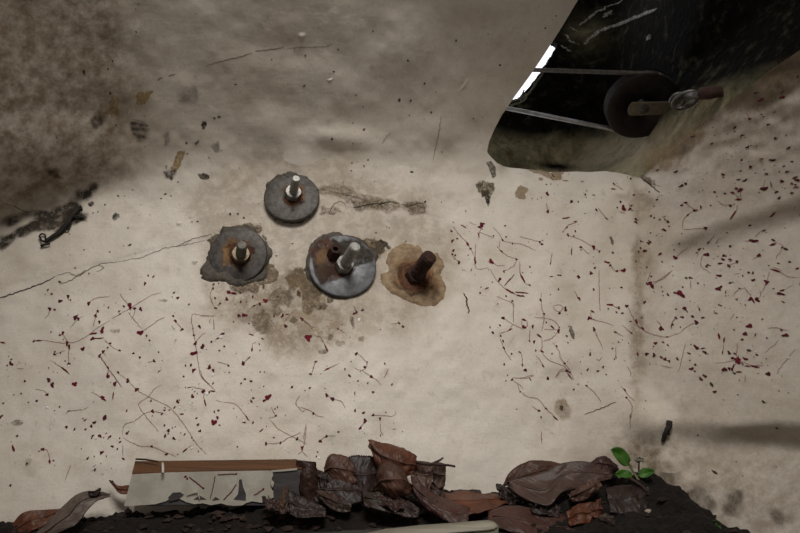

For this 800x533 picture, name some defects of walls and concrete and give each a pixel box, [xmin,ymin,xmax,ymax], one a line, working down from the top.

damp [0,211,54,250]
crack [0,234,211,298]
corrosion [223,238,255,272]
corrosion [311,237,373,283]
corrosion [394,258,440,293]
damp [36,264,344,460]